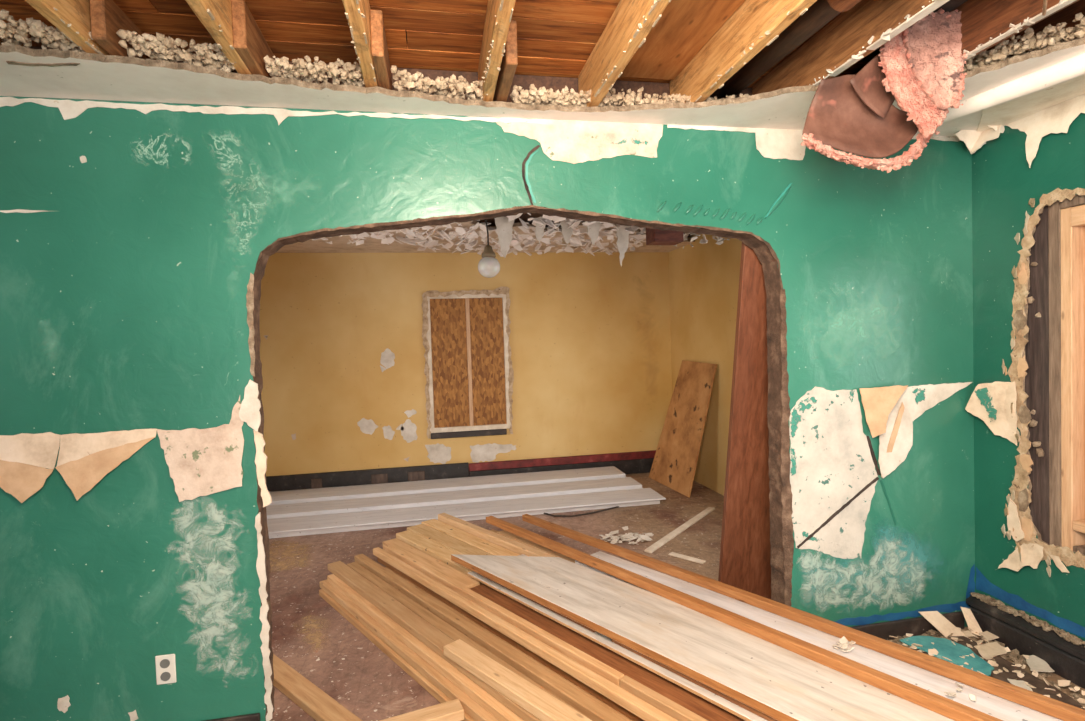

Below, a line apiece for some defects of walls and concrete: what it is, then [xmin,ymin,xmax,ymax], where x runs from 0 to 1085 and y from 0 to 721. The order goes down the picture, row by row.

peeling [0,97,806,165]
peeling [930,53,1085,168]
peeling [212,135,270,260]
flaking render [965,188,1085,577]
flaking render [239,205,930,721]
peeling [170,502,246,674]
flaking render [57,695,71,713]